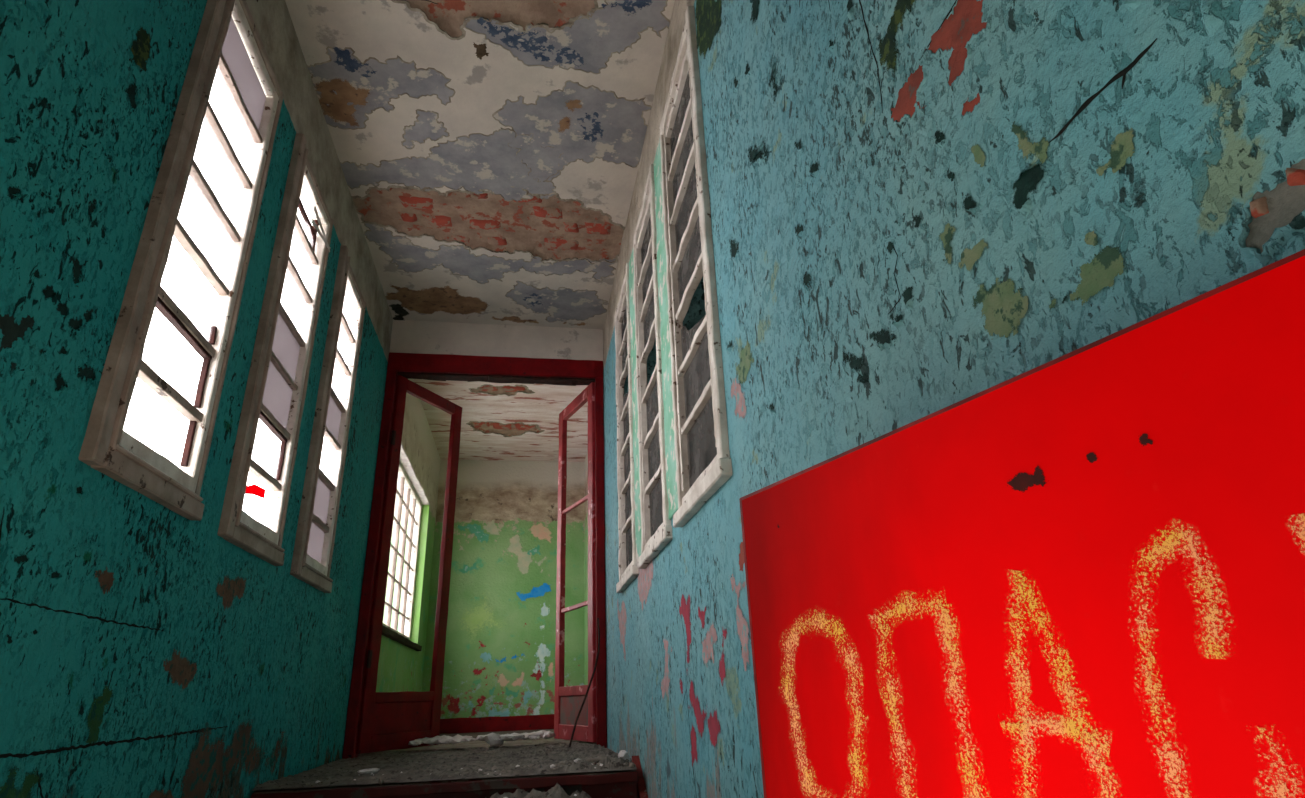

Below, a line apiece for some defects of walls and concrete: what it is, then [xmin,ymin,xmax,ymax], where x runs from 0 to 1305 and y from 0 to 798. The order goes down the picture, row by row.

peeling [695,0,722,59]
spalling [750,0,760,23]
peeling [878,0,991,125]
flaking render [307,0,670,323]
spalling [1010,121,1053,218]
flaking render [1238,149,1305,264]
flaking render [466,421,545,437]
peeling [457,519,554,601]
crack [0,598,164,631]
peeling [730,540,750,671]
peeling [447,640,554,717]
crack [0,726,228,798]